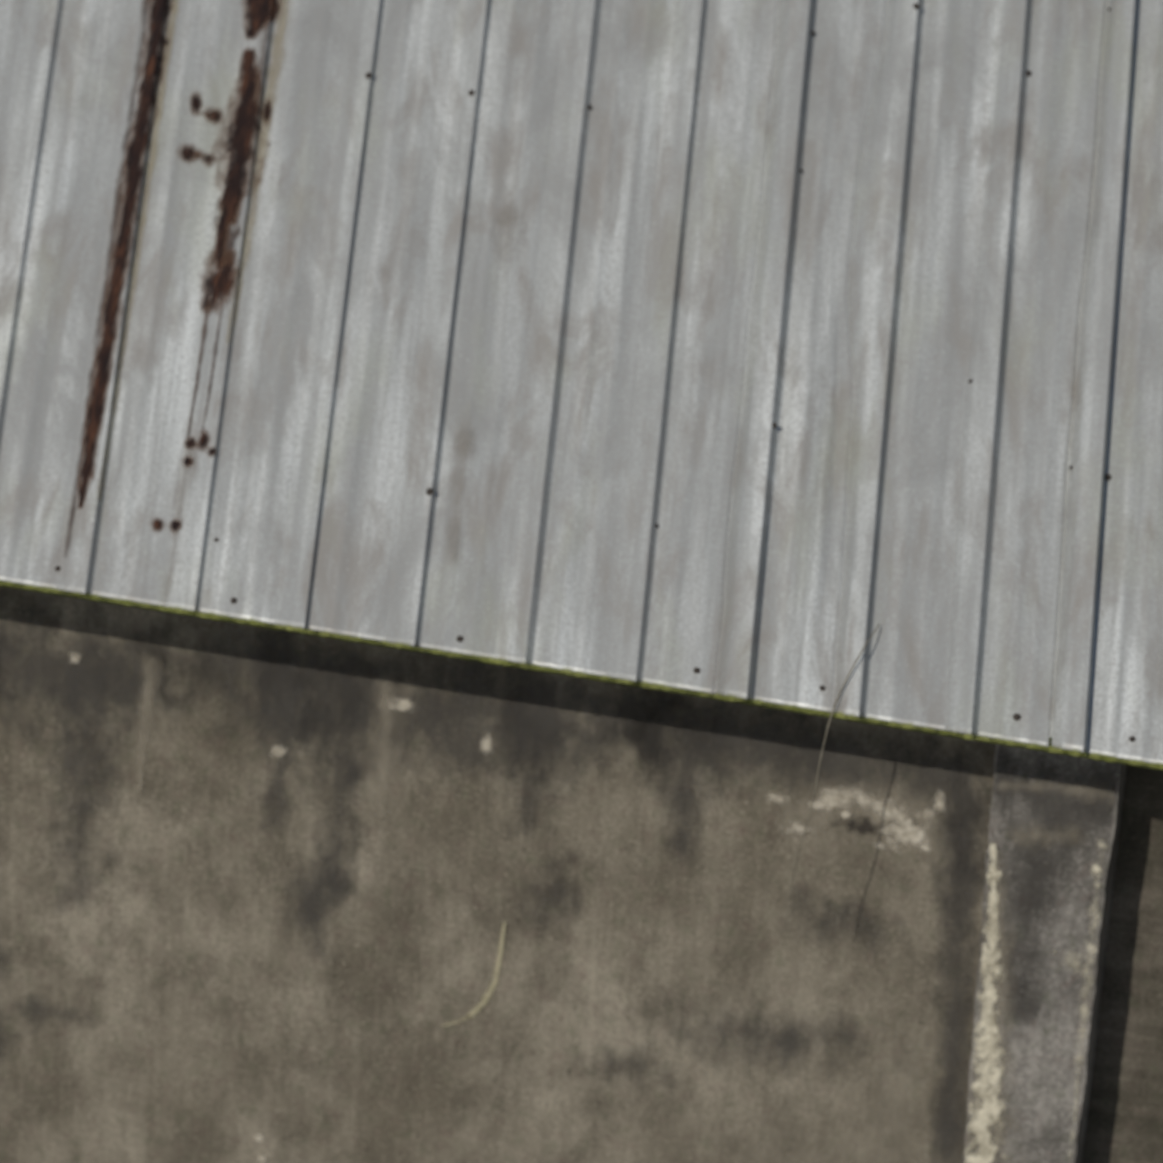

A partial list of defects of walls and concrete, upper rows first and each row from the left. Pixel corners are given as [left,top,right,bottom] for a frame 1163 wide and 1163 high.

rust [70,0,171,526]
rust [181,0,280,466]
rust [153,519,181,531]
damp [0,635,165,788]
damp [196,630,971,815]
damp [995,751,1114,915]
damp [936,812,977,1159]